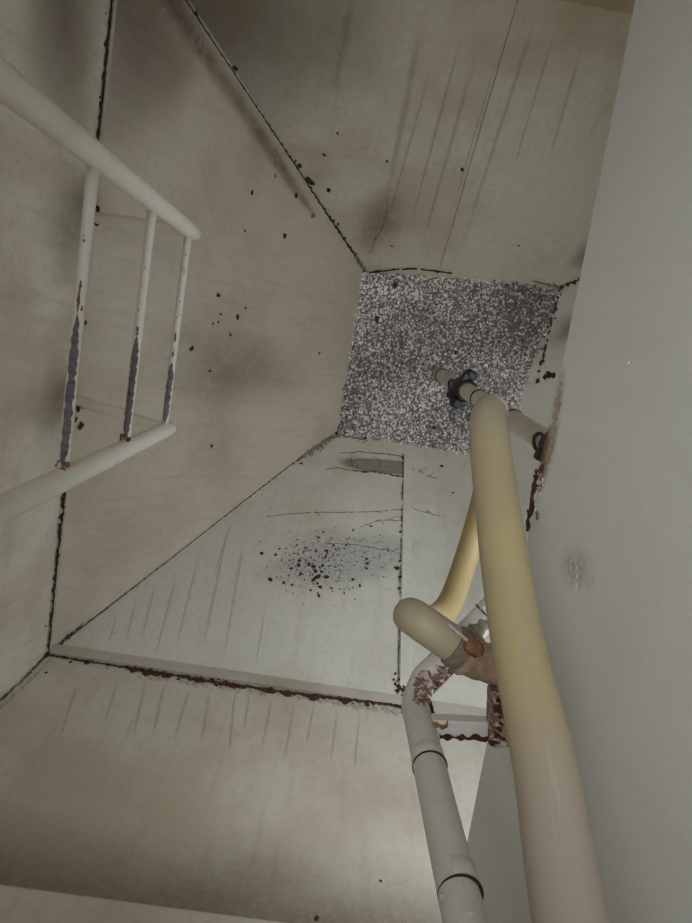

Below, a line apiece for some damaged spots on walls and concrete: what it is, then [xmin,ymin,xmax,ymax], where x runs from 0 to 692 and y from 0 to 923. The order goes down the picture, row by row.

corrosion [526,371,563,532]